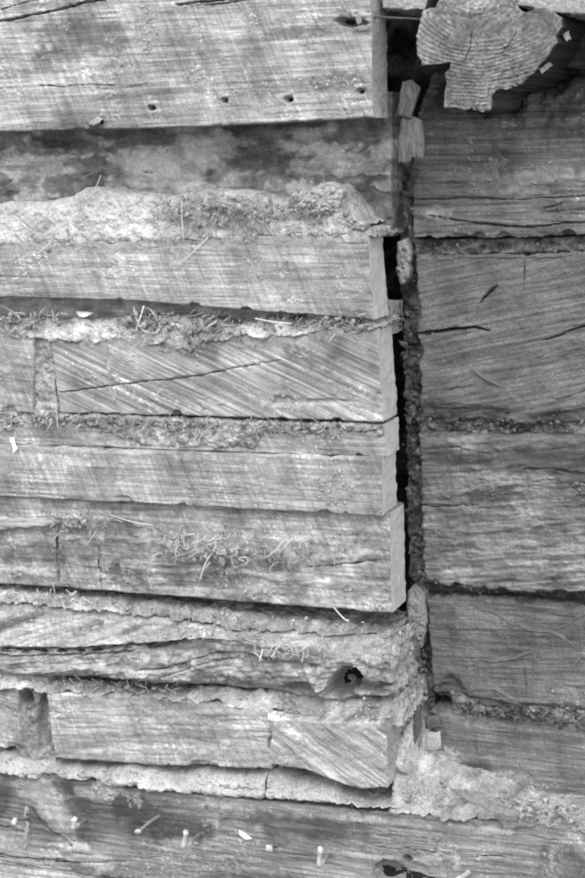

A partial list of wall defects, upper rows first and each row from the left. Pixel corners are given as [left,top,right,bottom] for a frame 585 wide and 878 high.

crack [0,0,97,22]
crack [69,362,269,391]
crack [2,640,175,652]
crack [136,650,225,671]